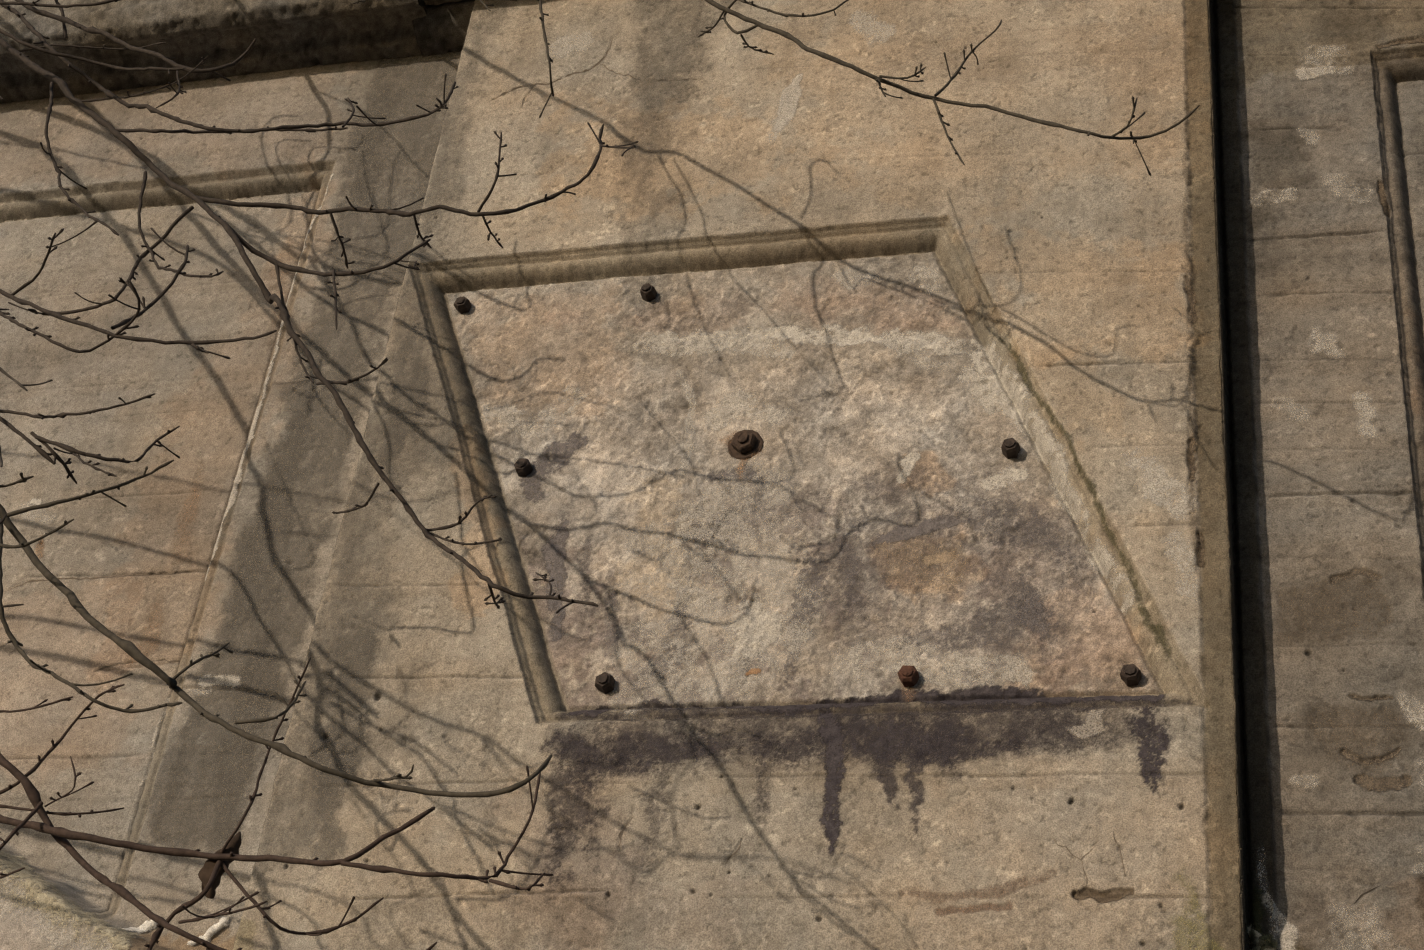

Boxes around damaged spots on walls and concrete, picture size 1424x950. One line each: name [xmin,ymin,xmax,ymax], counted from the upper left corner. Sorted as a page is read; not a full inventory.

damp [140,4,498,867]
damp [482,388,588,503]
damp [633,324,1133,612]
damp [1123,452,1197,596]
damp [541,465,1192,882]